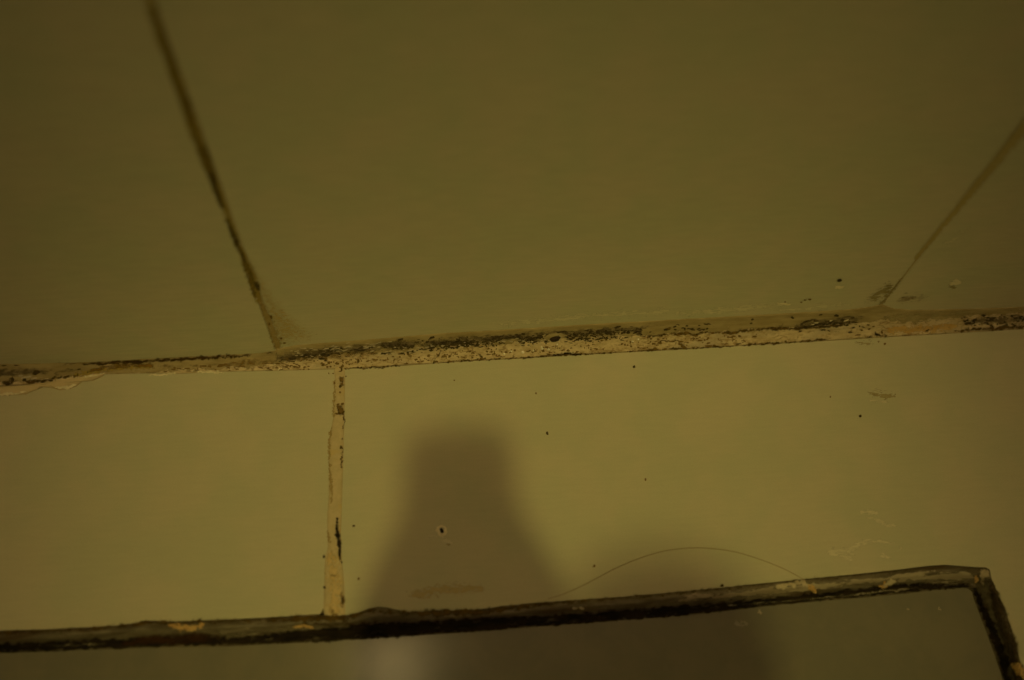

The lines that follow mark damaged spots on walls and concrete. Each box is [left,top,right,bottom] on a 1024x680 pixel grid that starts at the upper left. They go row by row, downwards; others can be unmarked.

damp [145,0,757,468]
damp [777,314,887,345]
damp [955,314,1024,333]
damp [0,365,81,386]
damp [0,579,1024,680]